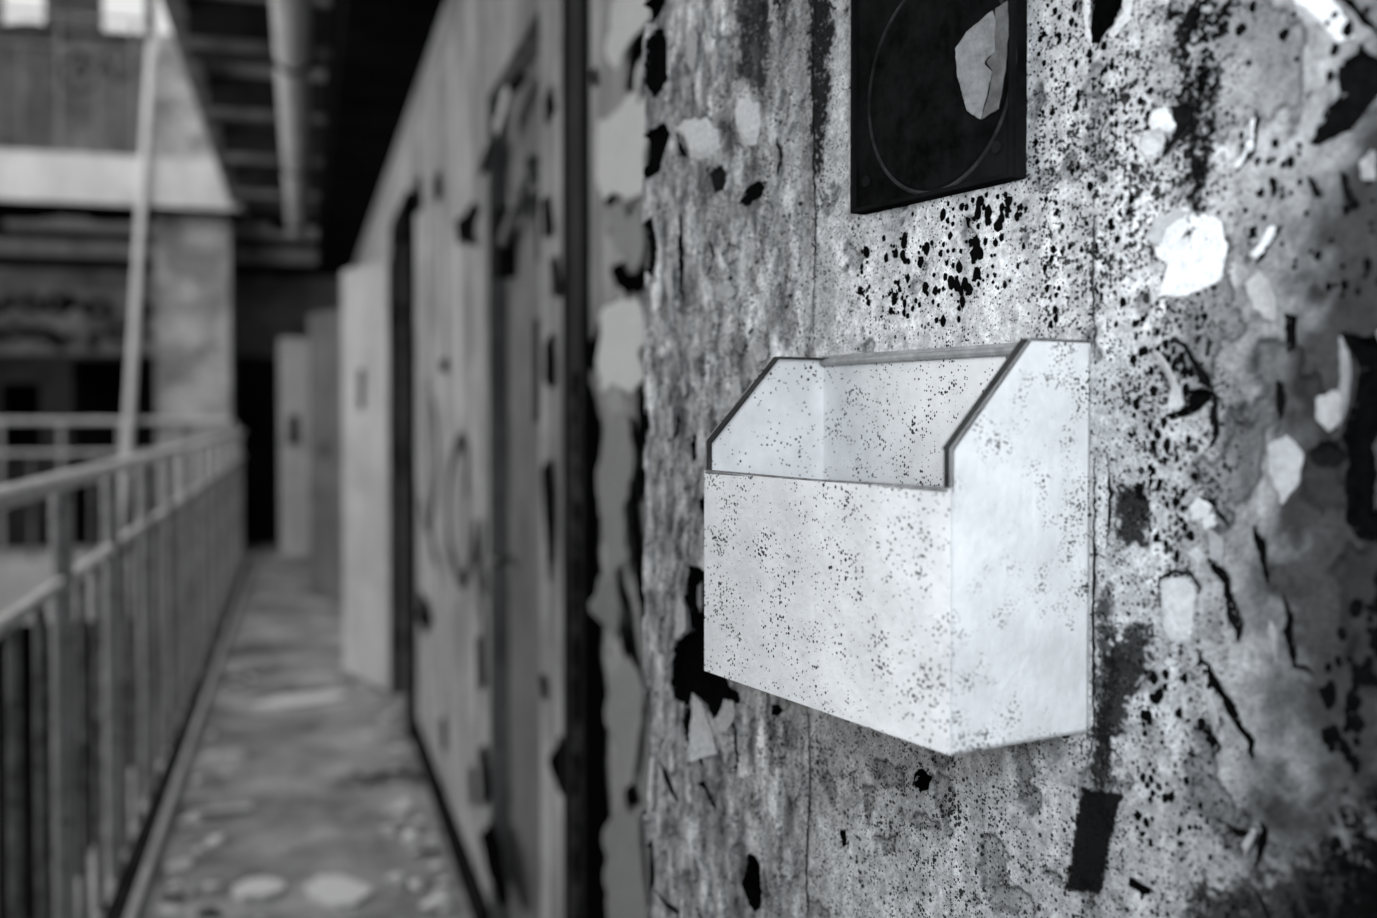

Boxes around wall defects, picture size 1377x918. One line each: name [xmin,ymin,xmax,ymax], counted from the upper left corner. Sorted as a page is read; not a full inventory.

damp [1037,1,1153,169]
spalling [1082,0,1133,46]
damp [1163,0,1256,239]
damp [1239,131,1303,239]
spalling [1295,0,1377,146]
damp [1325,6,1370,81]
damp [857,191,1135,329]
peeling [1245,271,1297,352]
spalling [541,458,555,583]
peeling [544,0,705,918]
damp [1114,297,1211,560]
spalling [1267,332,1377,543]